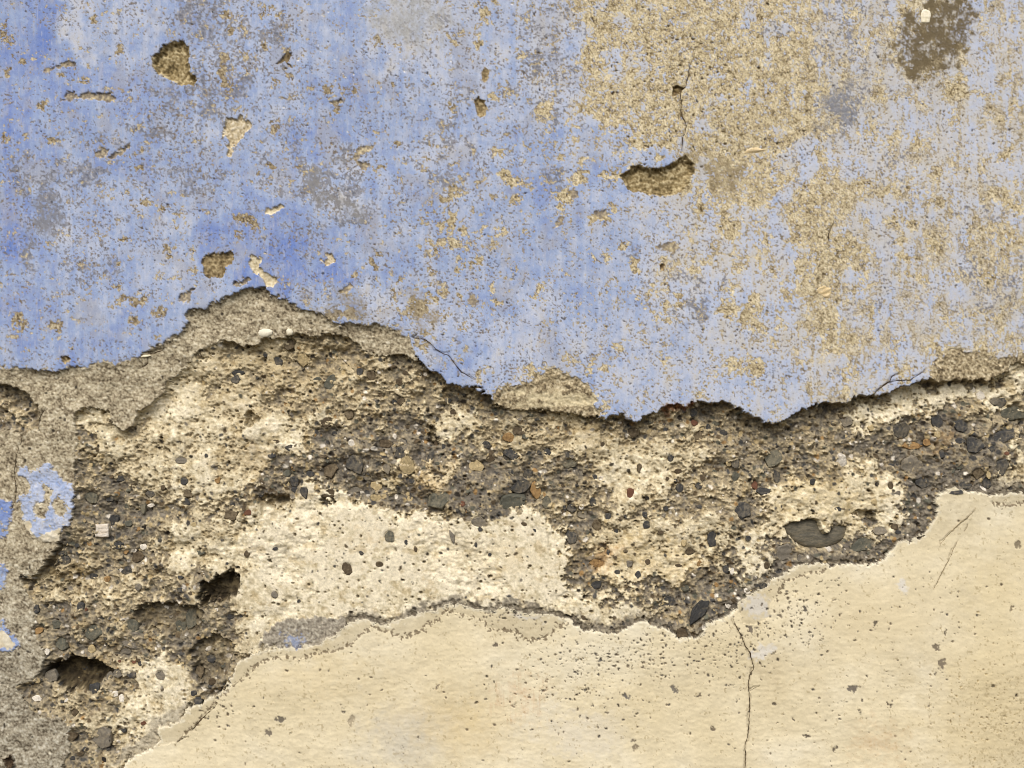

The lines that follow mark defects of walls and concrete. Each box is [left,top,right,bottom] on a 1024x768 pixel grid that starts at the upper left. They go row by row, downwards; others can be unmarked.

flaking render [152,41,197,86]
crack [680,50,696,150]
peeling [571,0,839,206]
flaking render [222,114,253,158]
flaking render [202,250,278,288]
flaking render [179,288,197,305]
flaking render [468,294,480,307]
spalling [0,333,1024,768]
crack [733,619,760,766]